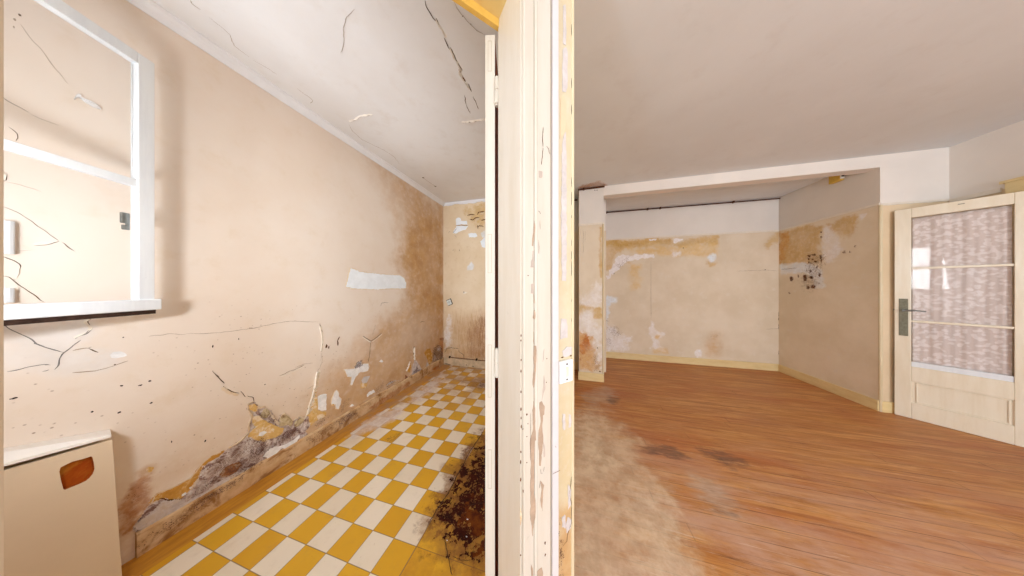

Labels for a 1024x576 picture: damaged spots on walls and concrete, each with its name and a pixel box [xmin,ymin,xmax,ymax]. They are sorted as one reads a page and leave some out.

crack [425,1,485,123]
crack [5,326,127,373]
crack [153,321,324,415]
flaking render [345,267,407,290]
water stain [273,144,485,444]
peeling [343,347,433,397]
flaking render [453,218,485,248]
water stain [574,224,724,411]
flaking render [133,390,354,533]